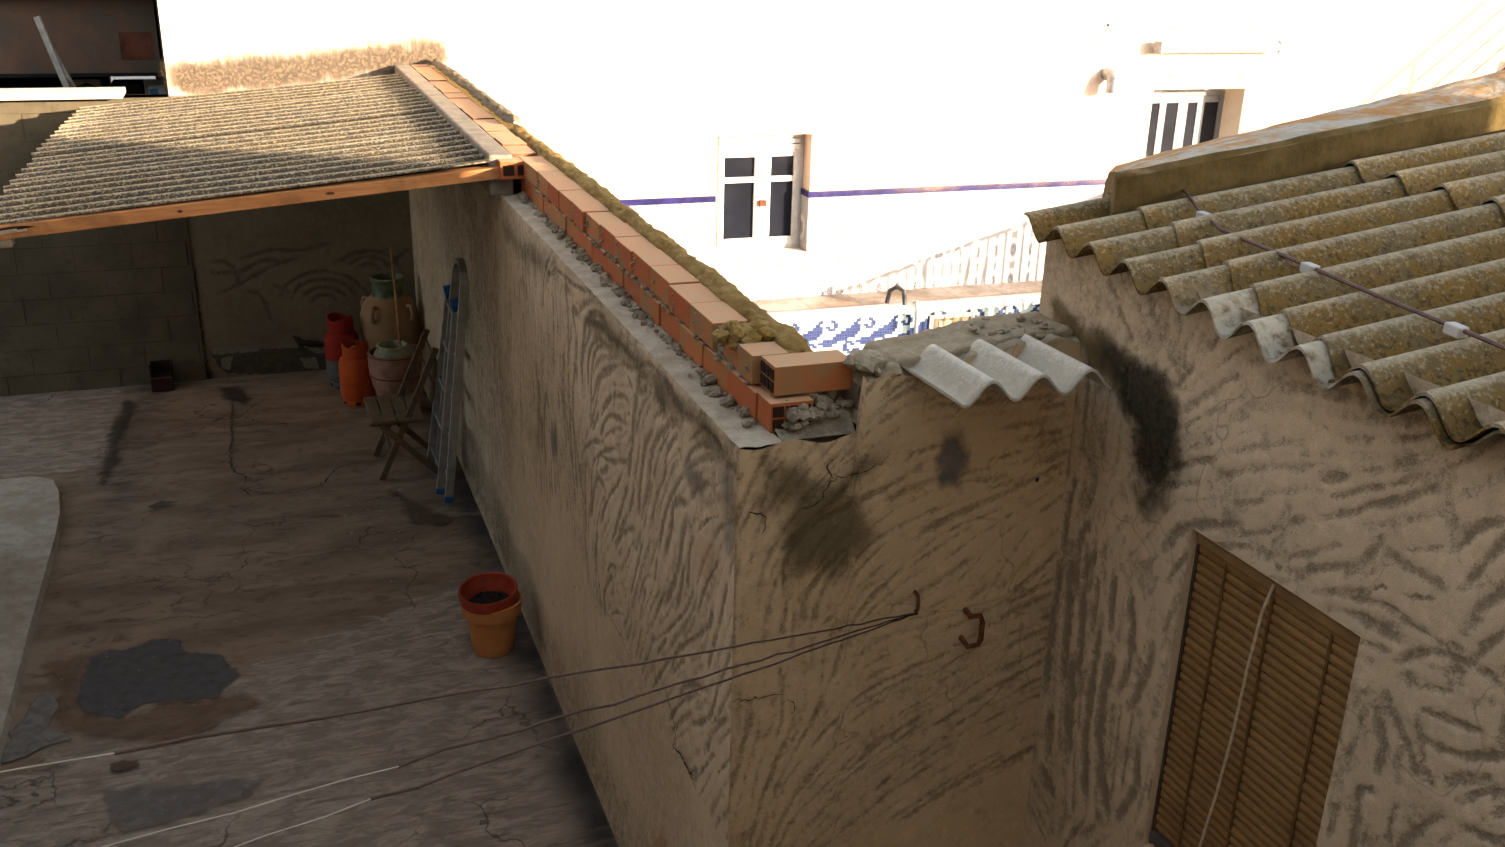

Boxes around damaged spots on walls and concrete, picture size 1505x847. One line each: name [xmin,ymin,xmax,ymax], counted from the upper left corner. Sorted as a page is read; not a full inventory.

mould [170,39,447,95]
crack [194,268,392,502]
mould [1101,343,1181,487]
water stain [774,468,870,573]